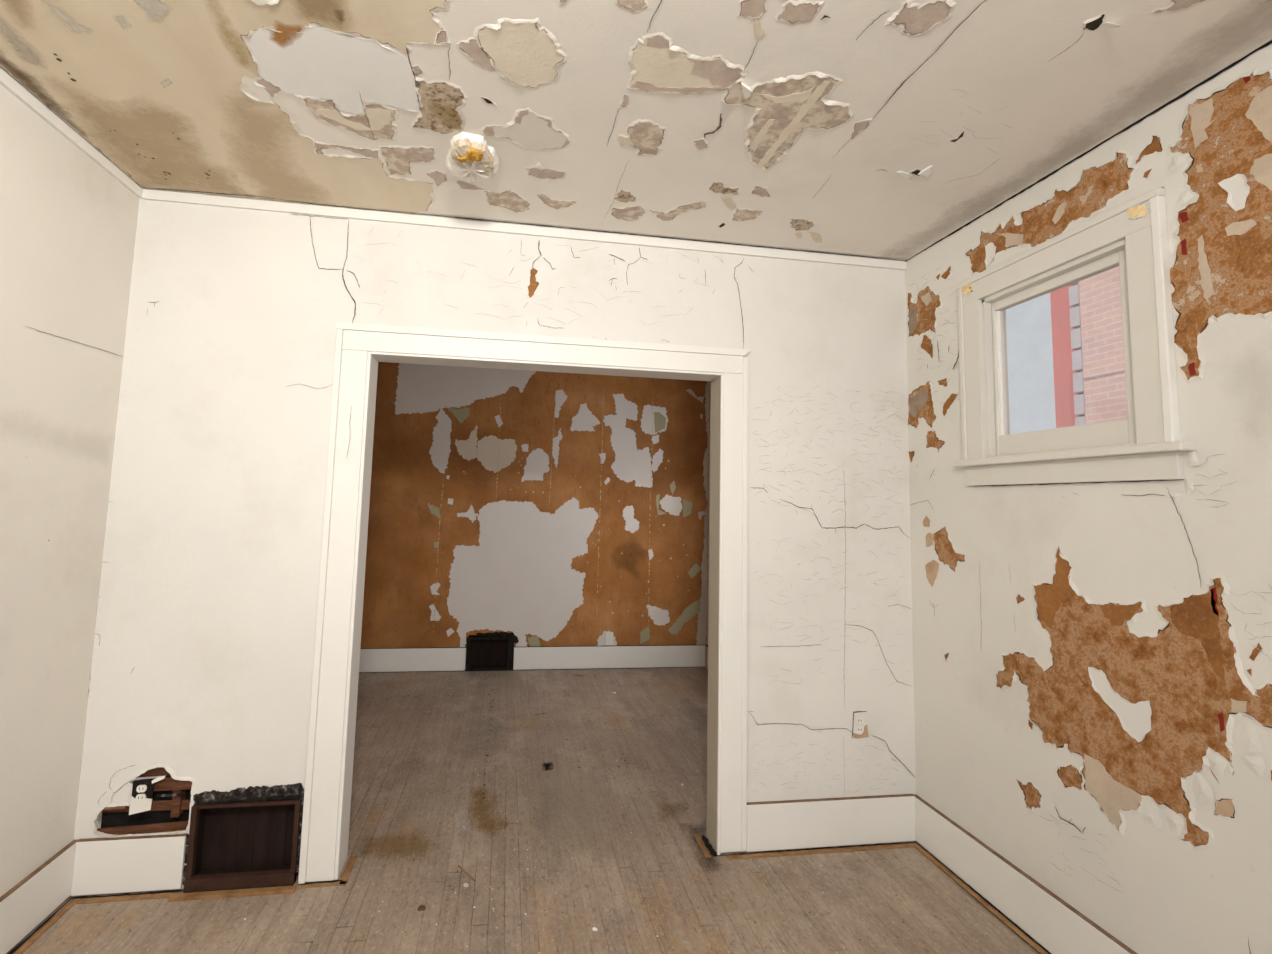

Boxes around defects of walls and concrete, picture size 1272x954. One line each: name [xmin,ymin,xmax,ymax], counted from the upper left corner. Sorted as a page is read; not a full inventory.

peeling [737,0,830,37]
peeling [0,0,577,215]
peeling [617,32,873,170]
crack [308,215,755,348]
peeling [608,181,771,228]
peeling [788,218,822,243]
peeling [907,265,952,359]
peeling [964,67,1272,384]
peeling [908,377,958,462]
peeling [428,497,598,647]
peeling [923,516,967,587]
peeling [994,543,1272,851]